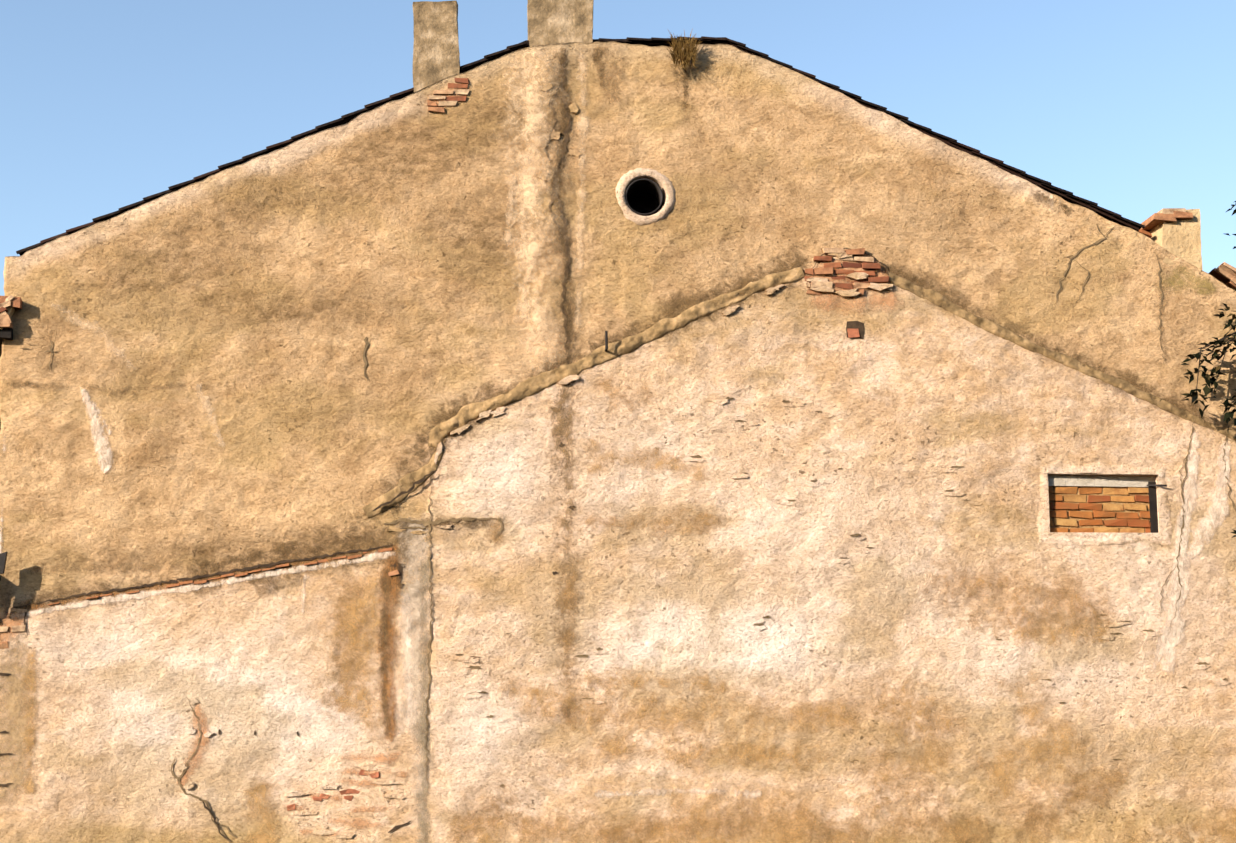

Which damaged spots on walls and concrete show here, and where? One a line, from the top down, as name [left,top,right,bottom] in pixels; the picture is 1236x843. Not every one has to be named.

peeling [427,78,470,113]
peeling [805,248,897,339]
crack [1054,223,1115,309]
crack [19,471,503,795]
water stain [926,575,1106,643]
crack [171,698,236,843]
spalling [286,754,411,838]
water stain [320,556,430,843]
water stain [596,789,984,843]
water stain [876,683,955,794]